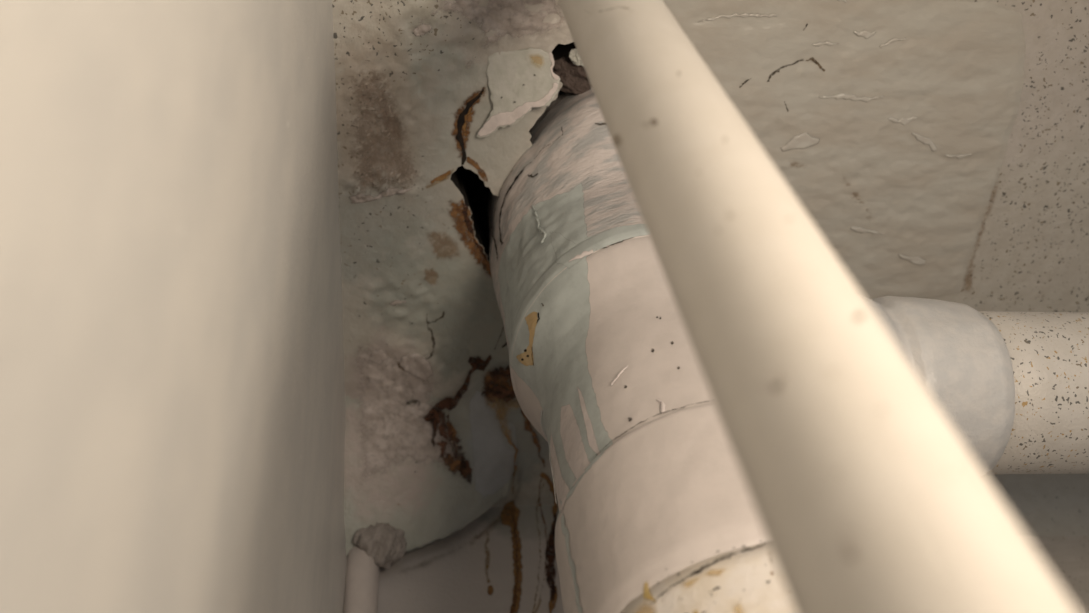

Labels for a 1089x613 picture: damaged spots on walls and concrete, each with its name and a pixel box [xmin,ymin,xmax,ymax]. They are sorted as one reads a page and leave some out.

peeling [477,48,591,139]
crack [739,57,825,111]
crack [430,87,563,258]
rust [433,200,491,275]
rust [425,355,558,613]